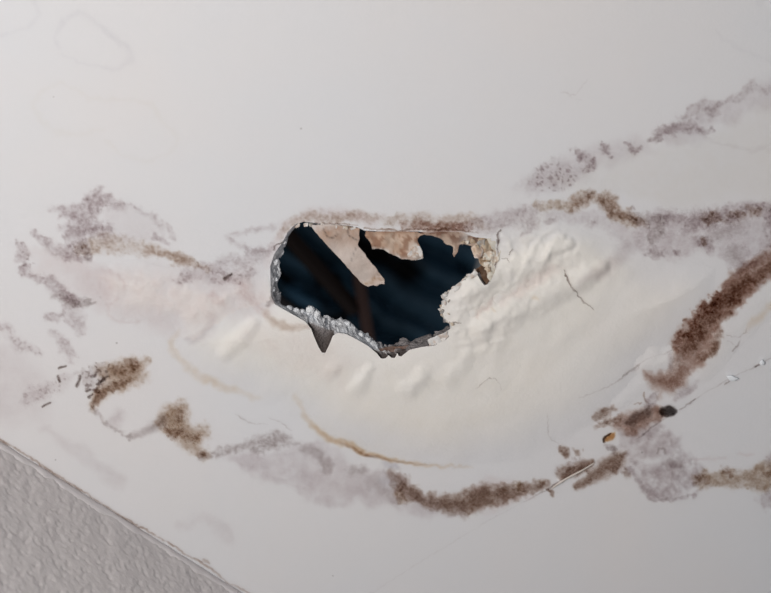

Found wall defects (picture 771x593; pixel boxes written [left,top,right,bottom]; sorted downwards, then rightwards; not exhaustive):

spalling [270,222,501,359]
leakage [678,258,771,353]
leakage [654,406,677,417]
leakage [562,454,623,488]
leakage [398,482,551,512]